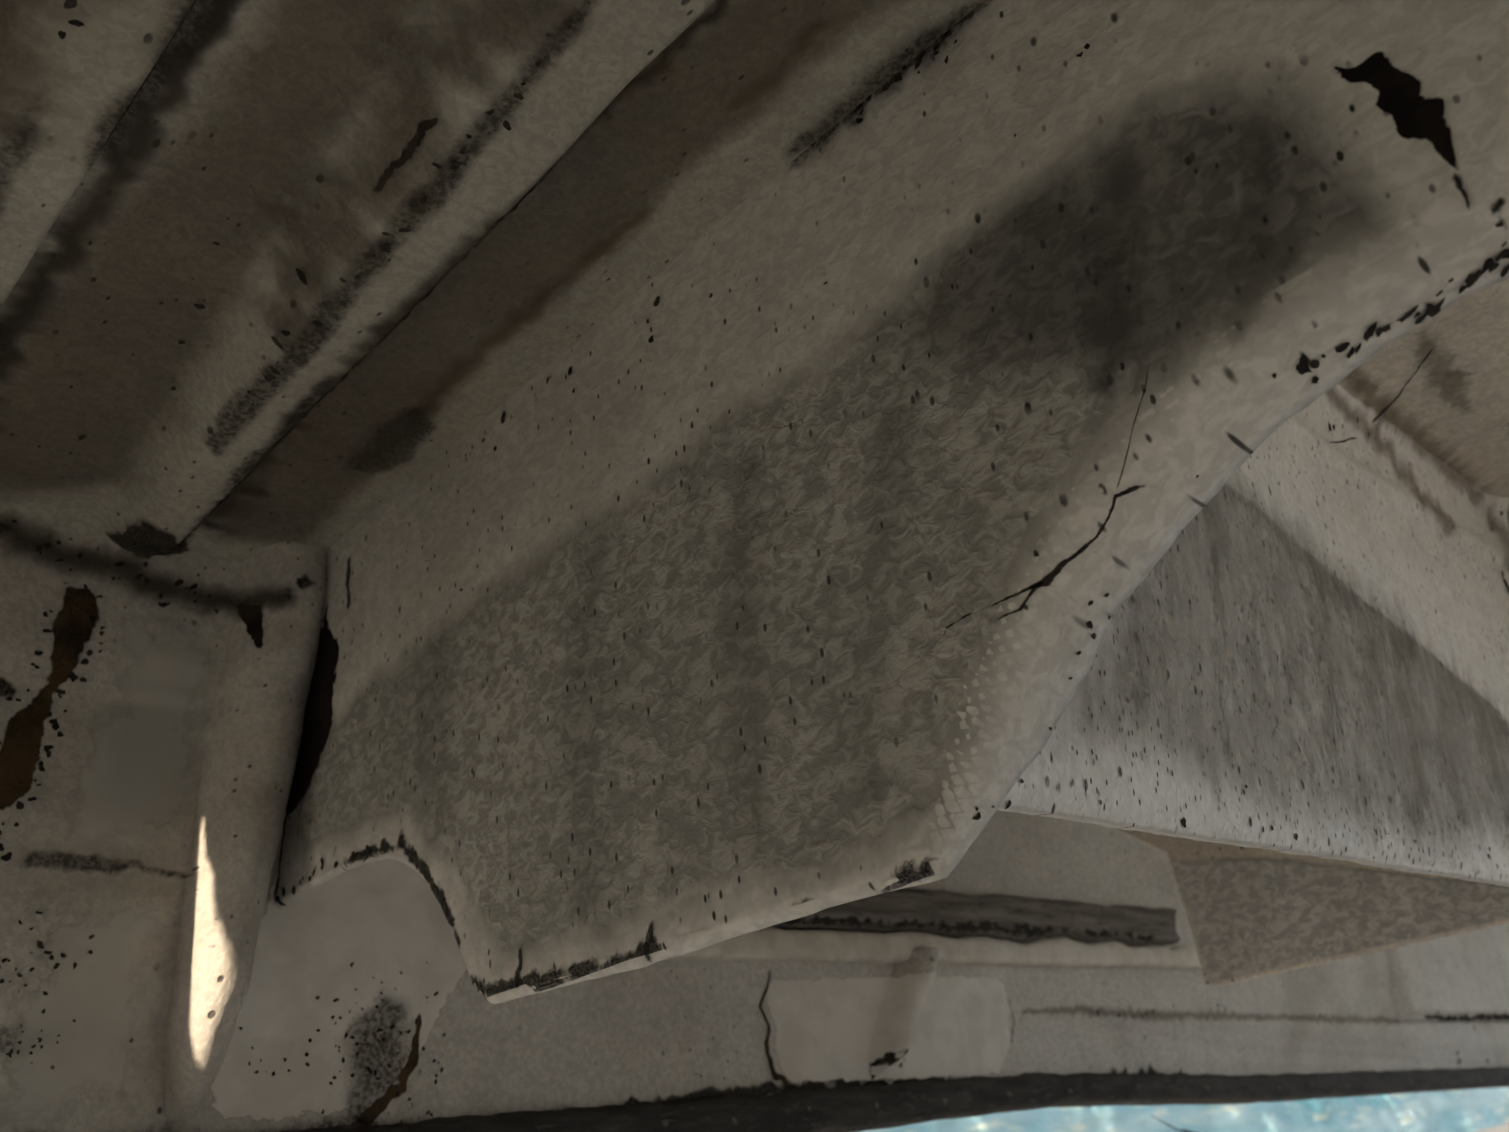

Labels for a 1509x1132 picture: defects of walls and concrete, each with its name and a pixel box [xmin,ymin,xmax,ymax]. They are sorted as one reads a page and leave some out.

leakage [599,0,728,116]
spalling [1334,52,1470,207]
leakage [207,0,590,454]
peeling [1296,198,1509,384]
leakage [0,188,532,617]
leakage [275,104,1351,997]
crack [943,369,1148,636]
peeling [1076,593,1110,655]
leakage [1046,486,1509,983]
crack [25,852,195,878]
leakage [248,971,443,1129]
leakage [621,1049,953,1106]